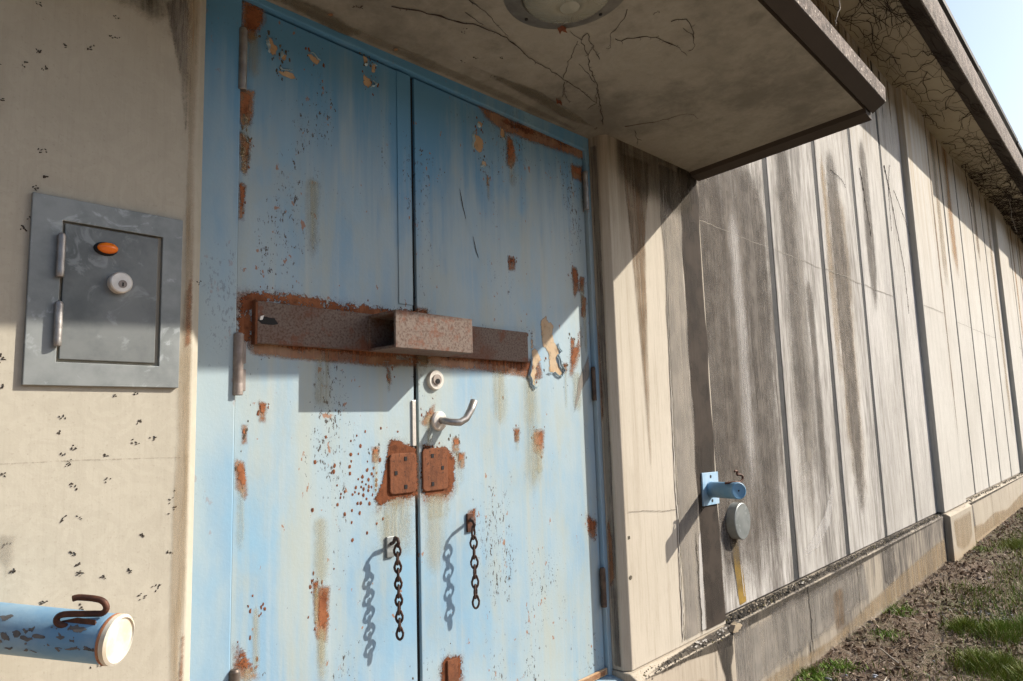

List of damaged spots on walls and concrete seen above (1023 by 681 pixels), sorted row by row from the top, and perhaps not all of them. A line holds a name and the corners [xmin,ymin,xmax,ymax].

corrosion [239,90,255,219]
corrosion [479,107,583,181]
corrosion [236,286,541,384]
peeling [528,316,566,390]
damp [624,166,648,403]
damp [776,152,833,553]
damp [821,156,863,505]
damp [924,121,956,414]
corrosion [331,430,467,524]
corrosion [307,571,330,640]
corrosion [440,655,463,681]
damp [717,564,868,681]